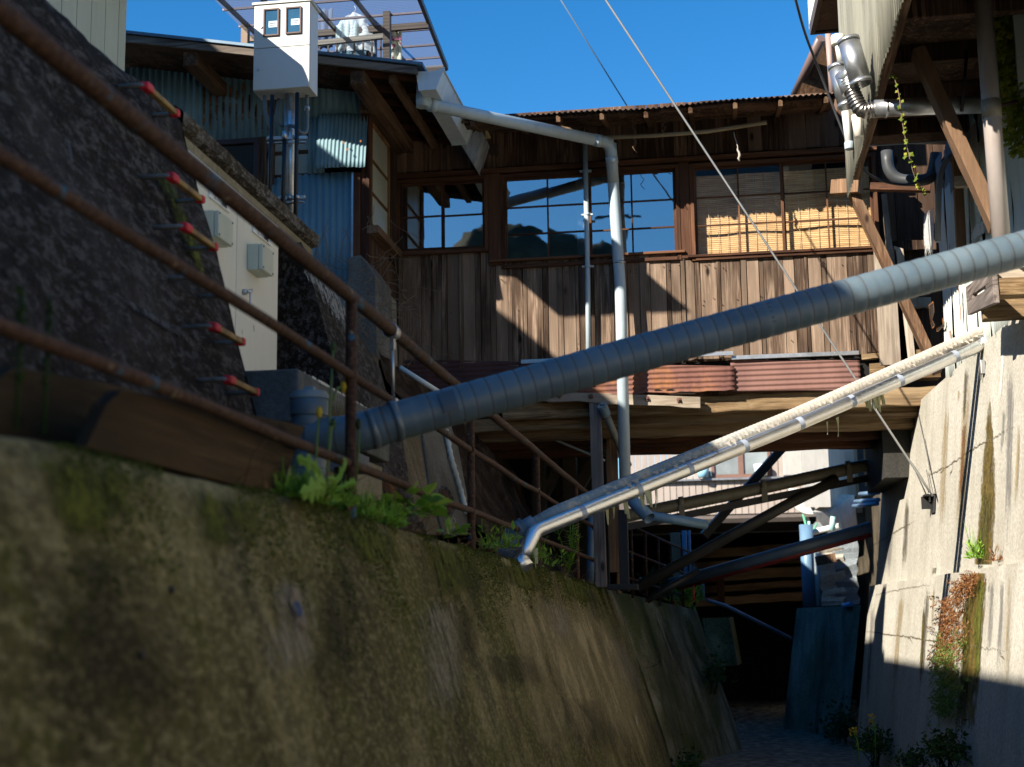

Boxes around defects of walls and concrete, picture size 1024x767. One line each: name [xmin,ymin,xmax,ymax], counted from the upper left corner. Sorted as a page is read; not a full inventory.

crack [931,431,1004,475]
leakage [977,492,991,563]
leakage [960,582,1008,713]